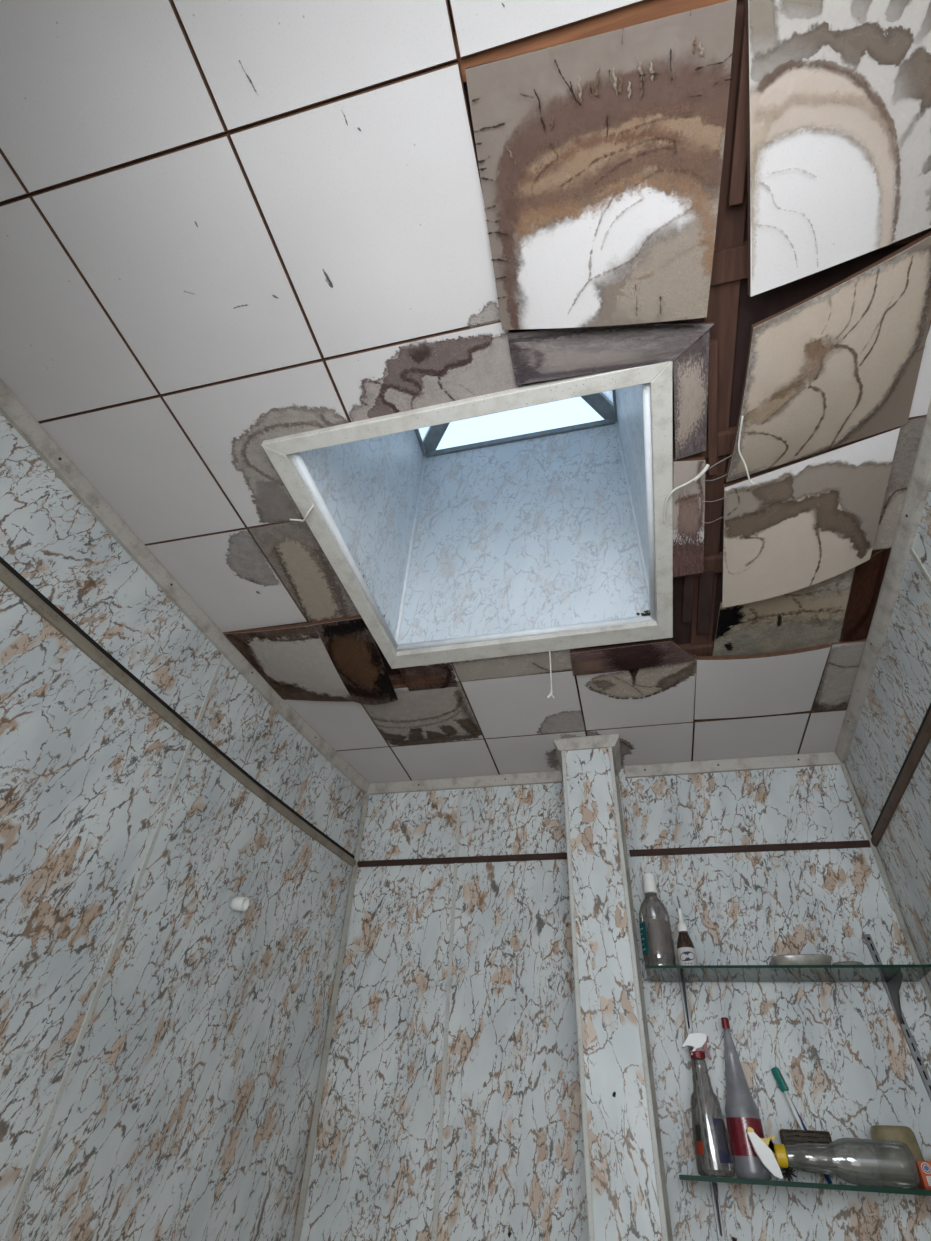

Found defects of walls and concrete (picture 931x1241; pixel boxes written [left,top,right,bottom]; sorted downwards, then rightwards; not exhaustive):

damp [225,0,931,746]